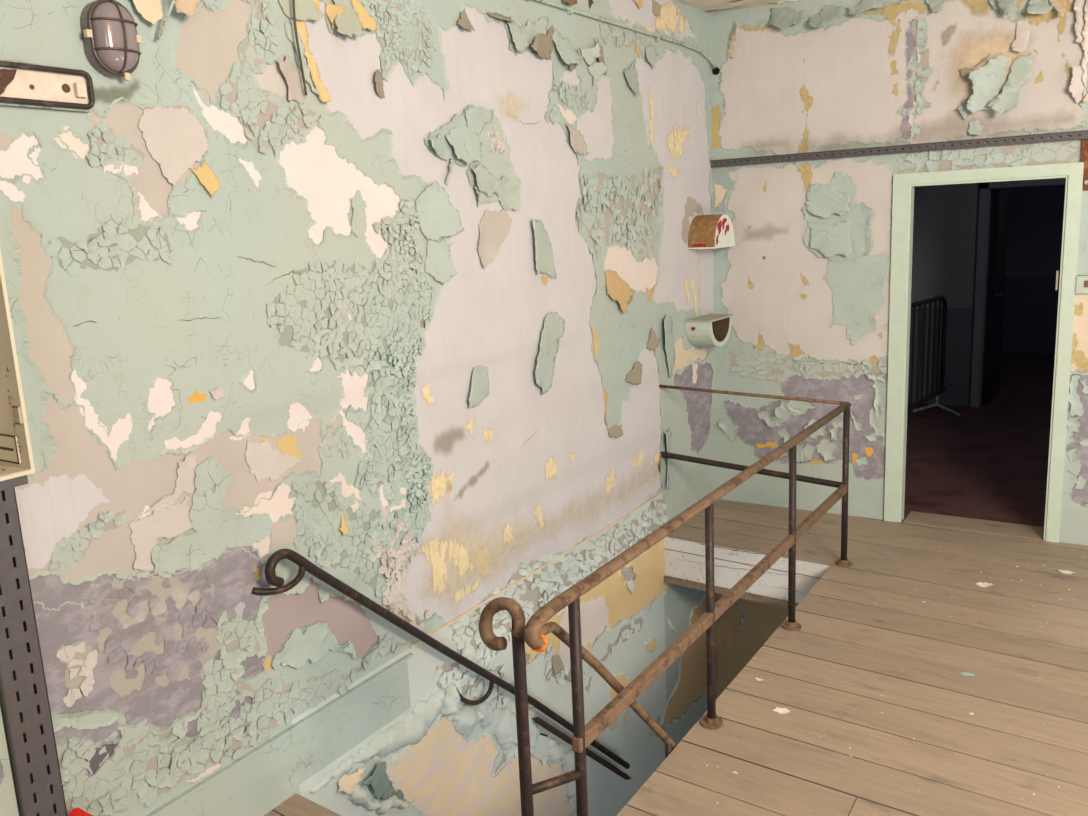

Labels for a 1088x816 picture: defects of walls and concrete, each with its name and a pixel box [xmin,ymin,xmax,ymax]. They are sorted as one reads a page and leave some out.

peeling [0,0,388,777]
peeling [251,0,1088,680]
peeling [608,672,631,701]
peeling [649,601,748,741]
peeling [187,758,233,782]
flaking render [386,714,576,816]